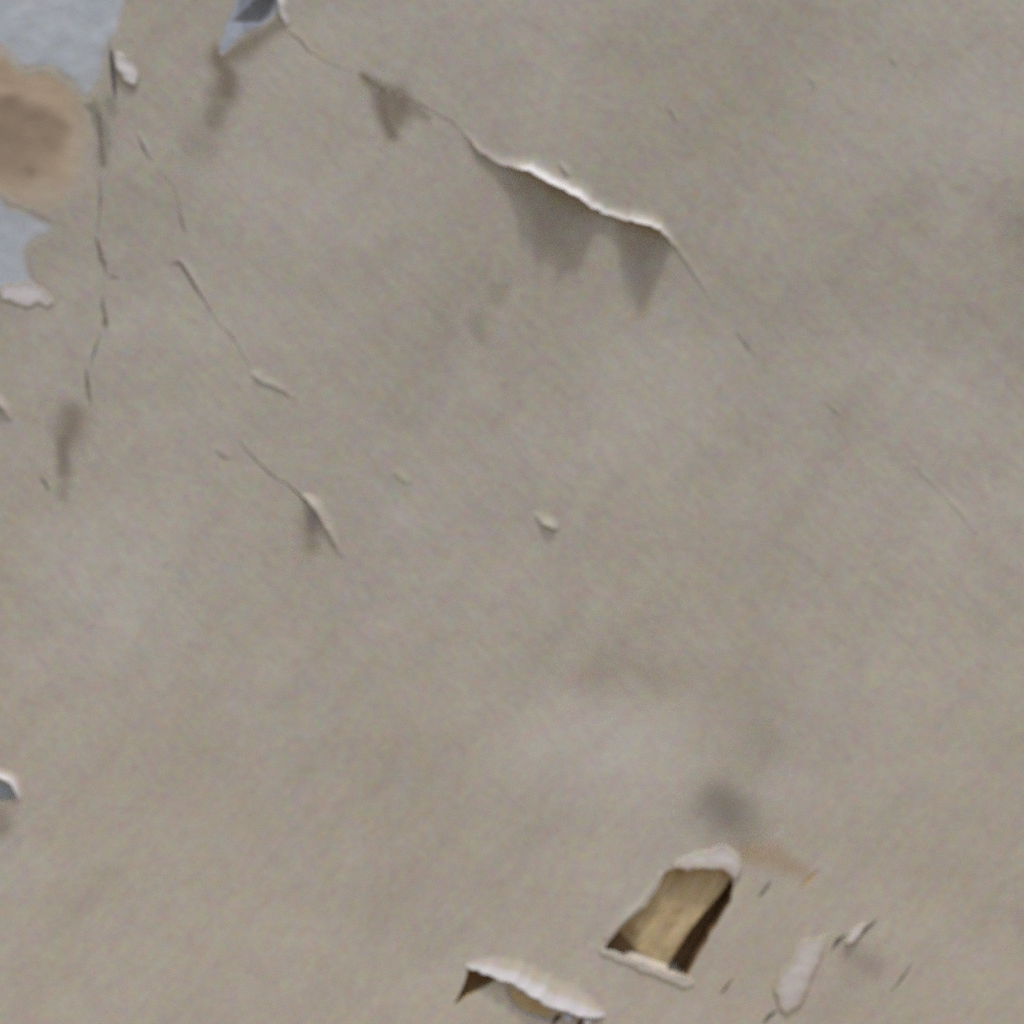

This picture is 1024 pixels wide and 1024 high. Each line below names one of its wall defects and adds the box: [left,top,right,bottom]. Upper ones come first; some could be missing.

spalling [219,0,291,54]
peeling [0,0,139,309]
crack [85,111,119,407]
crack [138,132,296,399]
crack [214,441,344,557]
peeling [454,955,606,1024]
spalling [598,844,742,989]
peeling [774,934,828,1014]
peeling [845,922,866,945]